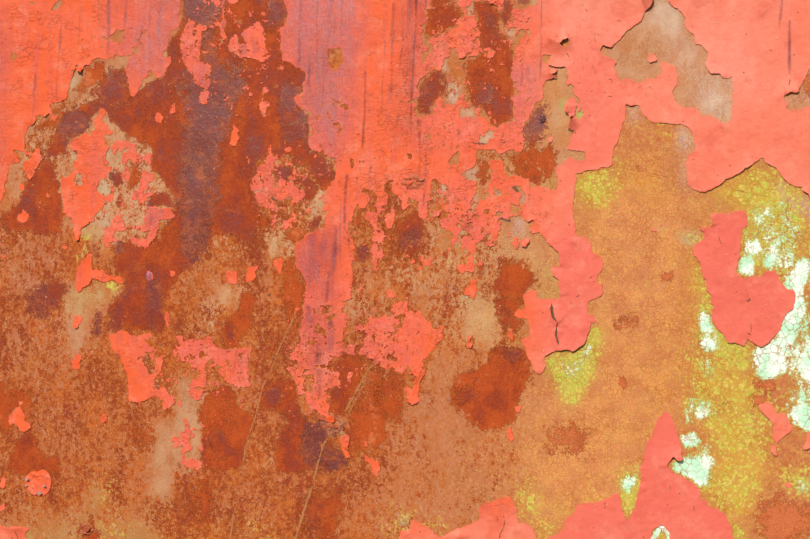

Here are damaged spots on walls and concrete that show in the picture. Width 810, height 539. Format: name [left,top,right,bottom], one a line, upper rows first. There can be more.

peeling [17,209,29,224]
peeling [49,45,140,118]
corrosion [0,0,336,337]
peeling [155,0,288,130]
corrosion [462,0,529,127]
corrosion [471,101,559,189]
peeling [600,0,734,123]
peeling [784,69,810,111]
corrosion [448,256,540,432]
corrosion [182,384,255,537]
corrosion [258,354,411,539]
peeling [651,525,670,539]